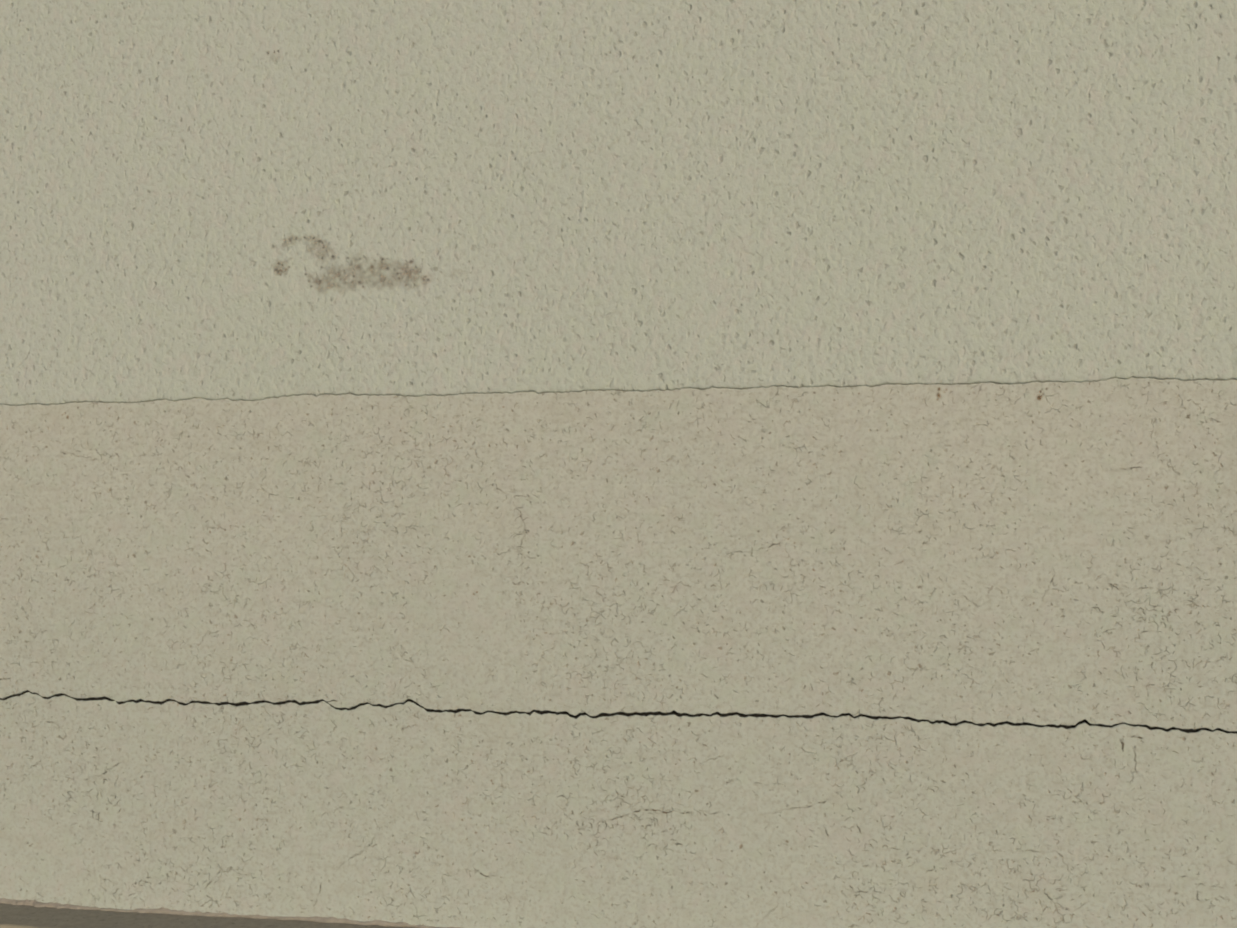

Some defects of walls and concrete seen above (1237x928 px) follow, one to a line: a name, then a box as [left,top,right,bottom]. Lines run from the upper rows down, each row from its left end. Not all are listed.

crack [0,678,1237,750]